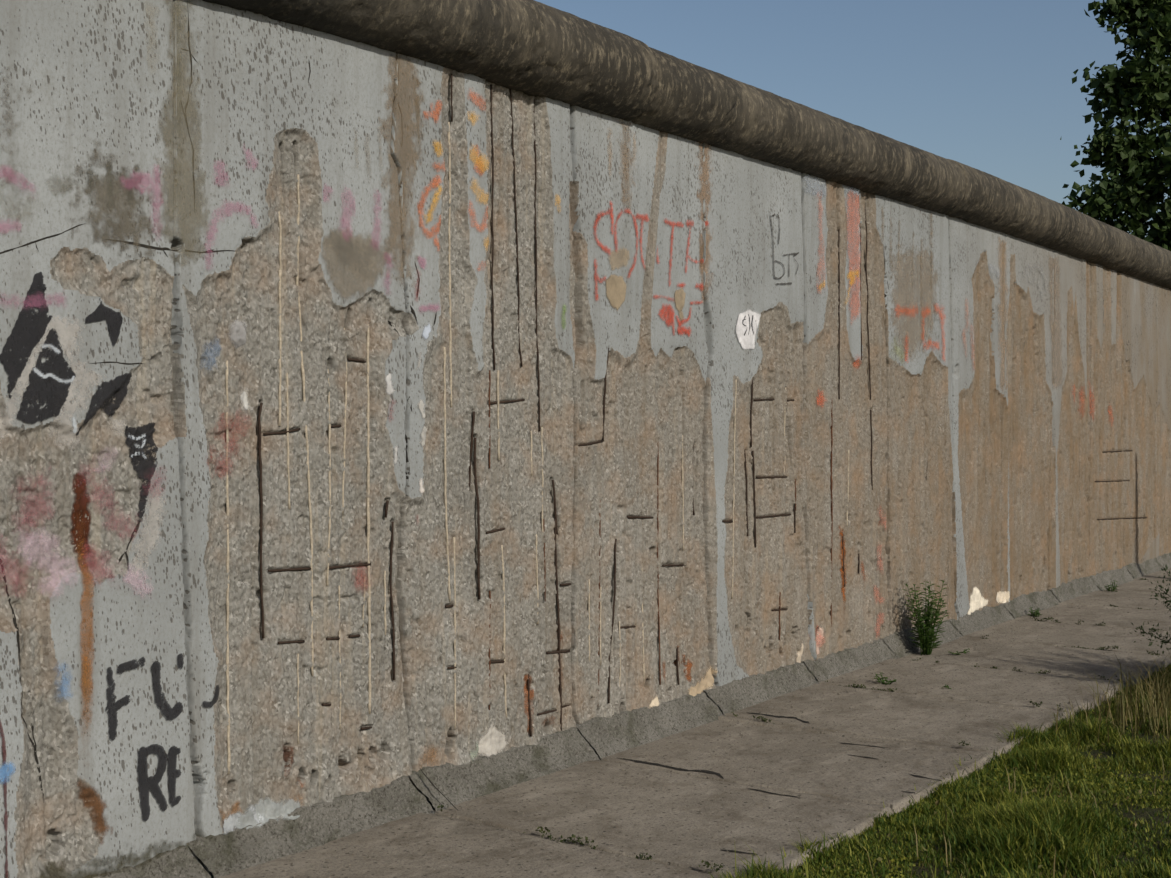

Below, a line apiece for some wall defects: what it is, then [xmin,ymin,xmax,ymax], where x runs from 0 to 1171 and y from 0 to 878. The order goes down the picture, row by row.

leakage [77,0,205,258]
crack [181,2,198,193]
rust [71,473,93,689]
spalling [0,247,187,878]
spalling [182,67,1171,833]
rust [78,783,107,832]